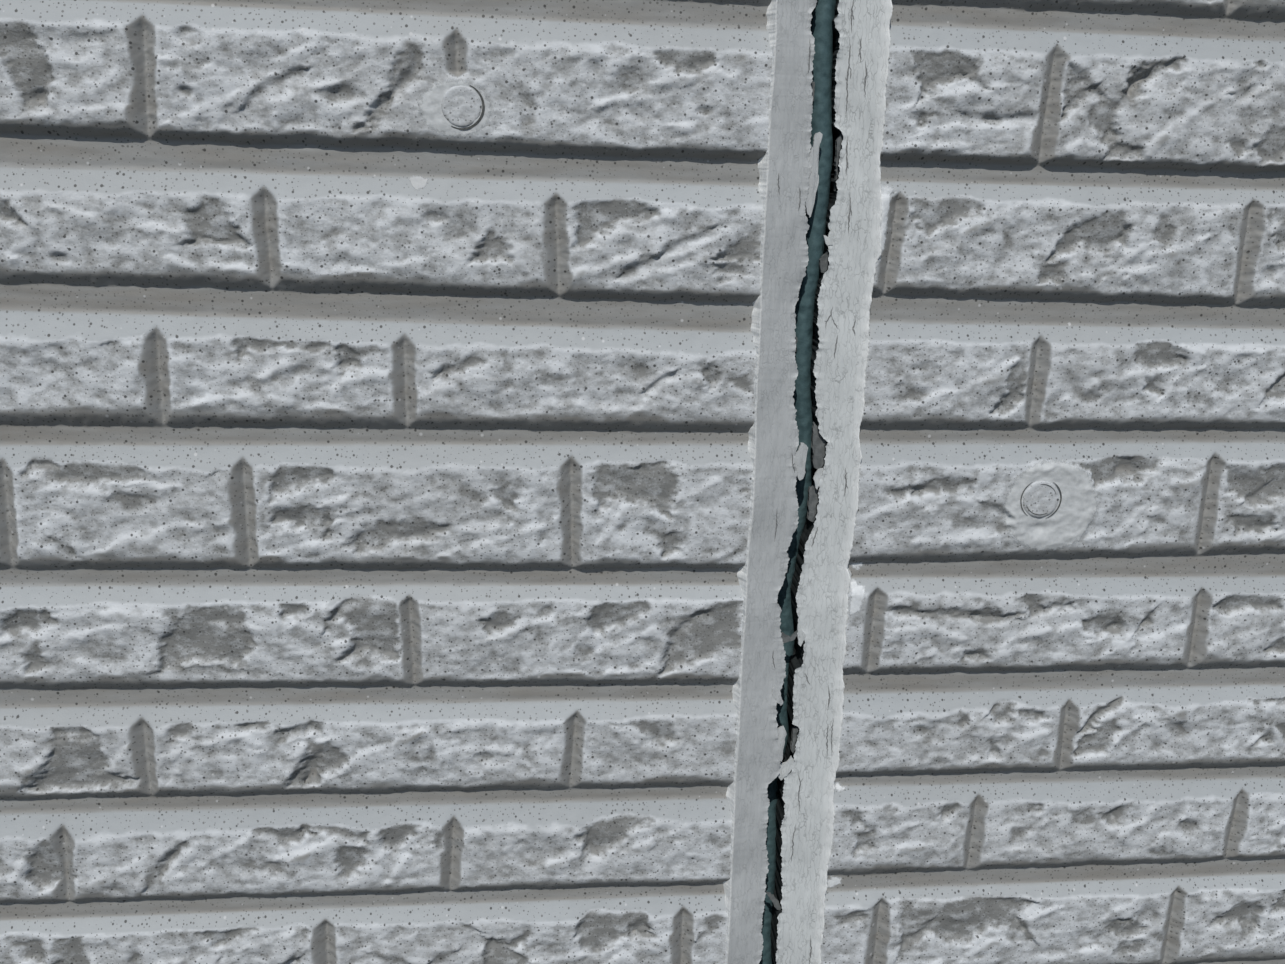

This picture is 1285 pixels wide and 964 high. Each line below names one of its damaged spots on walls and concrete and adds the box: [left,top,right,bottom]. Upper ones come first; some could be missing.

crack [759,0,867,964]